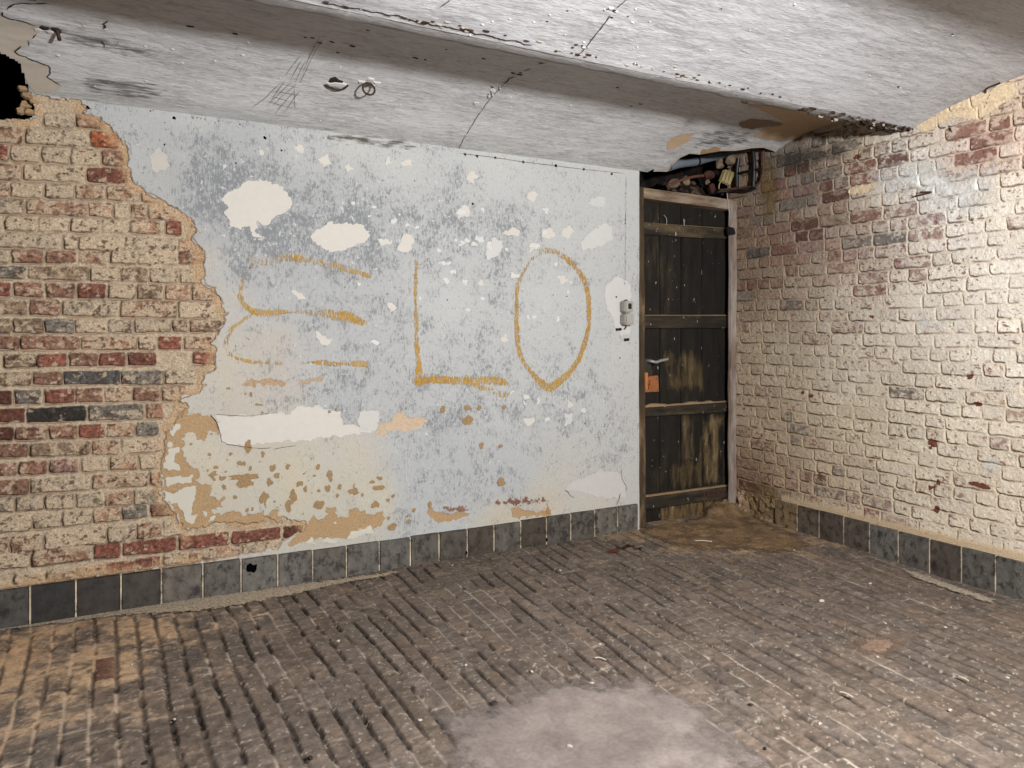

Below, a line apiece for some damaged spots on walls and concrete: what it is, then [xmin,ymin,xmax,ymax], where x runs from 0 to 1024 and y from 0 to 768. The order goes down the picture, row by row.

peeling [321,1,543,46]
peeling [625,63,914,172]
flaking render [0,11,470,589]
peeling [437,248,485,300]
flaking render [604,276,631,337]
peeling [462,405,482,425]
corrosion [495,497,550,514]
flaking render [566,469,627,499]